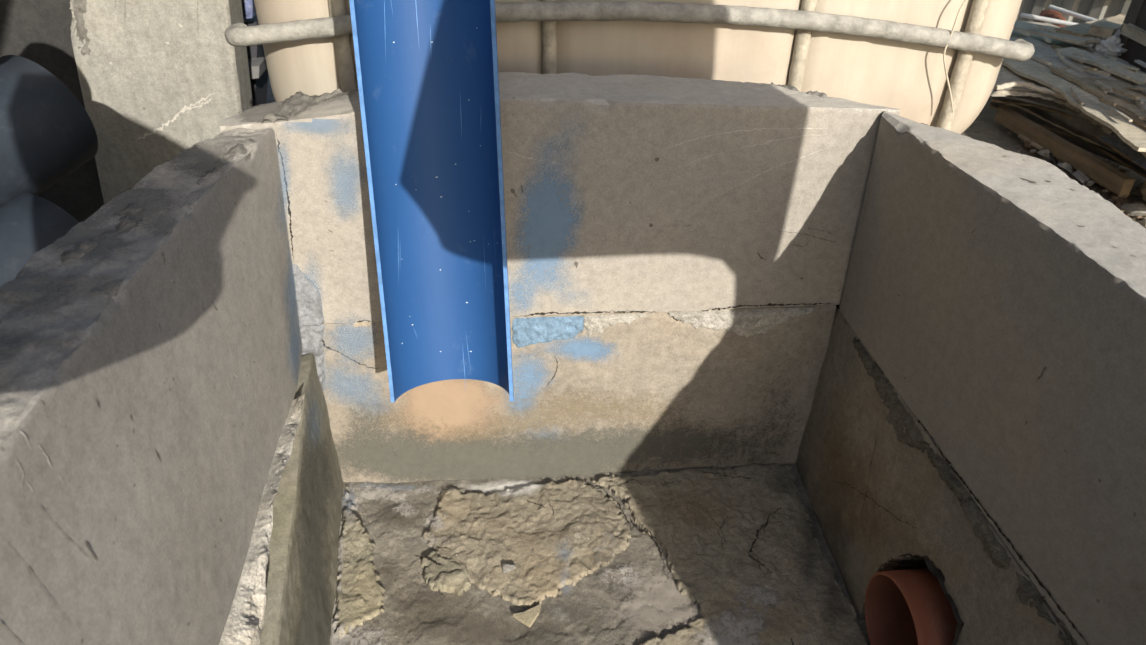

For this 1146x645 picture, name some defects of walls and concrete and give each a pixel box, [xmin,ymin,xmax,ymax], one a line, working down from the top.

crack [276,134,294,259]
spalling [292,264,326,390]
spalling [512,314,654,348]
spalling [668,307,813,338]
crack [585,470,755,579]
crack [711,507,782,578]
crack [918,420,1088,645]